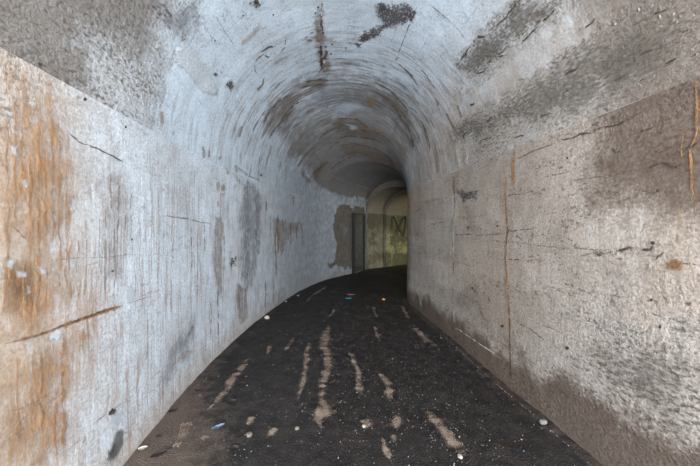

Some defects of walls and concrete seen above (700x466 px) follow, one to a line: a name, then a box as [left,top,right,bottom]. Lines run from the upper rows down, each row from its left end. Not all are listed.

crack [305,2,347,72]
crack [69,133,123,162]
rust [681,82,699,195]
rust [2,68,87,341]
crack [14,297,148,342]
water stain [214,172,267,323]
peeling [328,204,365,270]
crack [435,180,536,372]
rust [667,259,696,270]
rust [2,328,85,466]